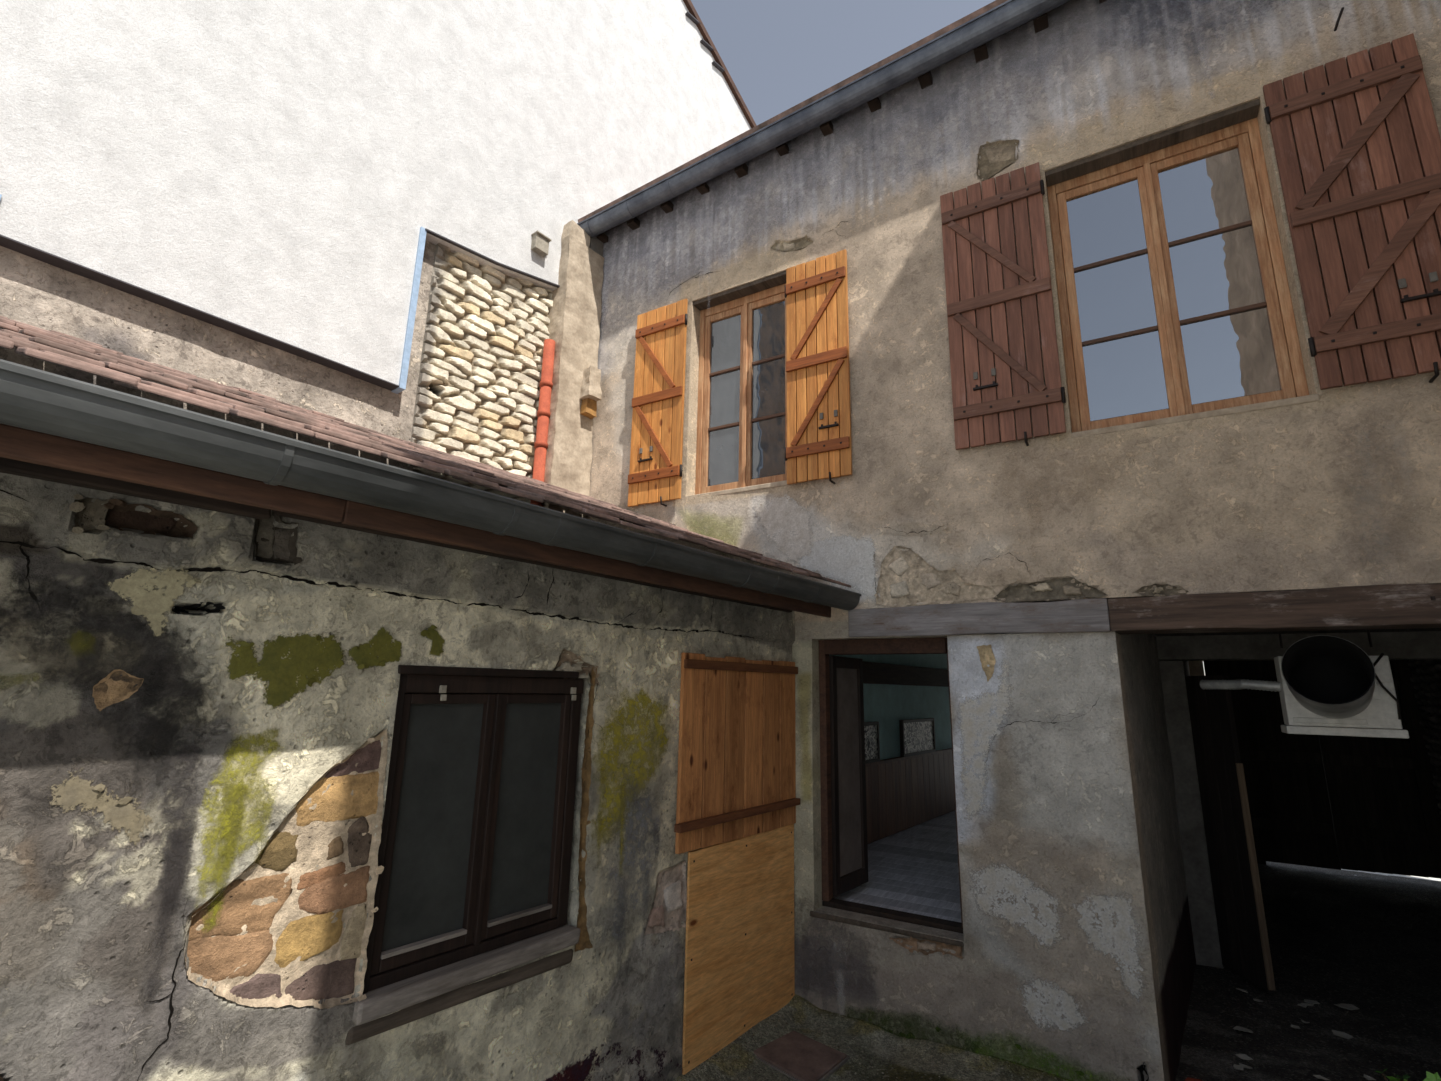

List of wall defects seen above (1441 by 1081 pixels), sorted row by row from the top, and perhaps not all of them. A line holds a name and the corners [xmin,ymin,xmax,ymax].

flaking render [976,140,1019,181]
crack [0,541,766,640]
flaking render [797,534,1108,607]
damp [0,570,215,941]
crack [137,891,192,1081]
damp [209,783,248,926]
flaking render [184,729,388,1009]
peeling [545,1043,684,1081]
peeling [1017,978,1088,1031]
peeling [969,862,1144,999]